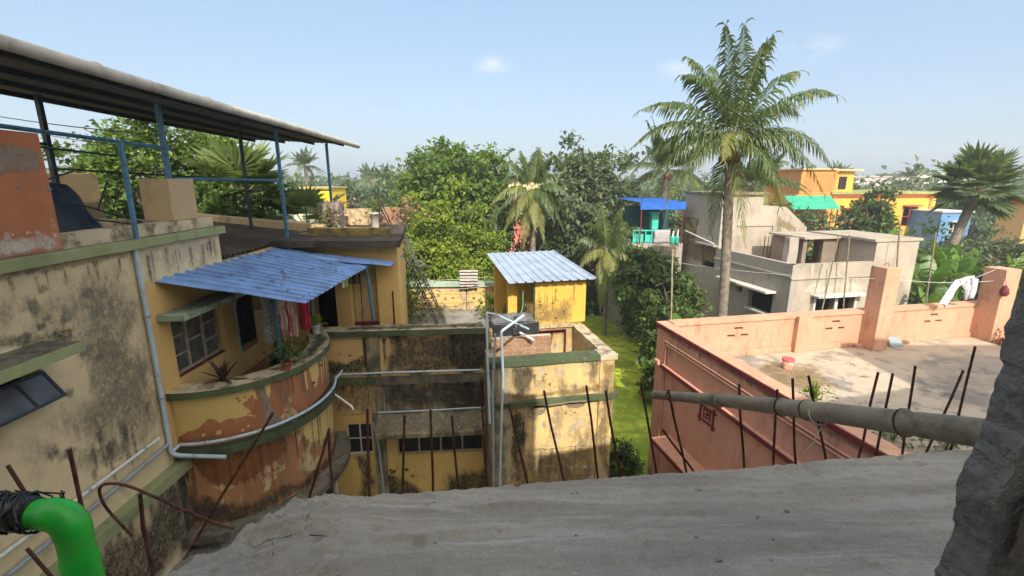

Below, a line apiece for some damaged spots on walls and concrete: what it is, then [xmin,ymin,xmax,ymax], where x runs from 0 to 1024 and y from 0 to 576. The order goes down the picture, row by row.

peeling [0,232,56,255]
leakage [0,254,158,475]
peeling [171,384,275,561]
rust [191,434,287,489]
peeling [304,355,327,394]
peeling [297,403,334,498]
leakage [266,322,490,453]
leakage [511,361,614,487]